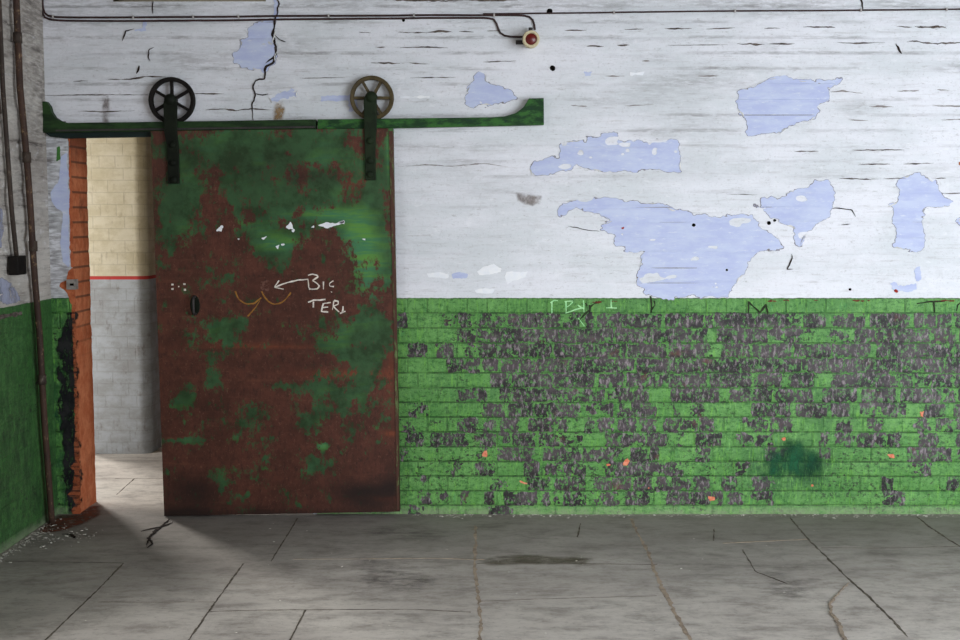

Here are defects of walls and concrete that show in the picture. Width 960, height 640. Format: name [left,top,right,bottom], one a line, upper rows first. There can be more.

crack [396,0,507,8]
crack [194,0,285,118]
peeling [232,0,279,73]
crack [360,30,471,78]
peeling [735,75,843,136]
peeling [530,131,682,176]
peeling [557,179,836,300]
peeling [888,172,953,252]
corrosion [59,268,76,305]
peeling [399,312,960,514]
damp [769,443,820,477]
crack [828,582,850,640]